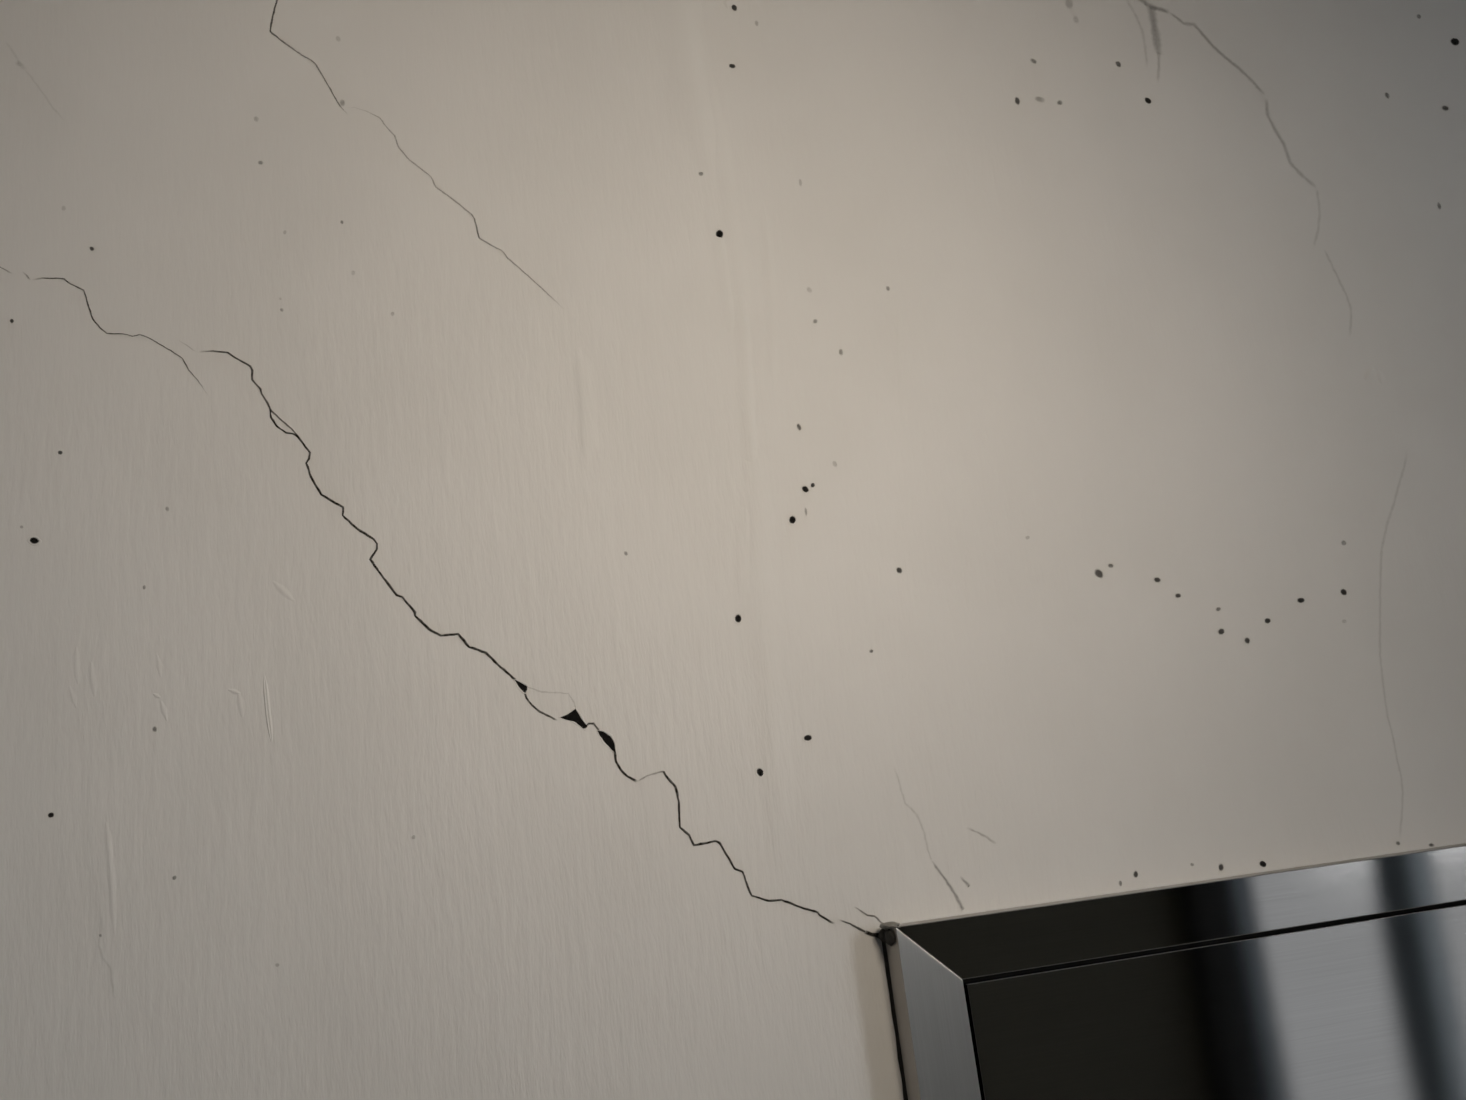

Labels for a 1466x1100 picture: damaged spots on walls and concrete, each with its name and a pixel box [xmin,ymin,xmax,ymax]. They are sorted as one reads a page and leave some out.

crack [270,0,340,106]
crack [44,278,879,938]